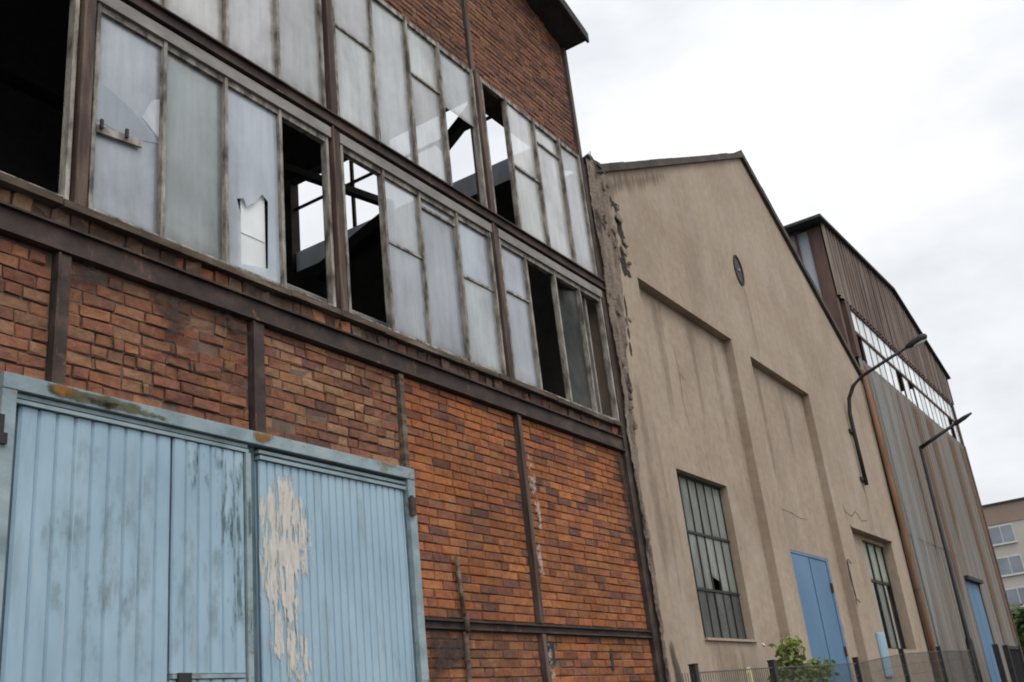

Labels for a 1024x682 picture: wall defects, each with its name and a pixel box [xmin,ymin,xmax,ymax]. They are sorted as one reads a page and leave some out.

peeling [249,473,313,682]
flaking render [586,158,671,682]